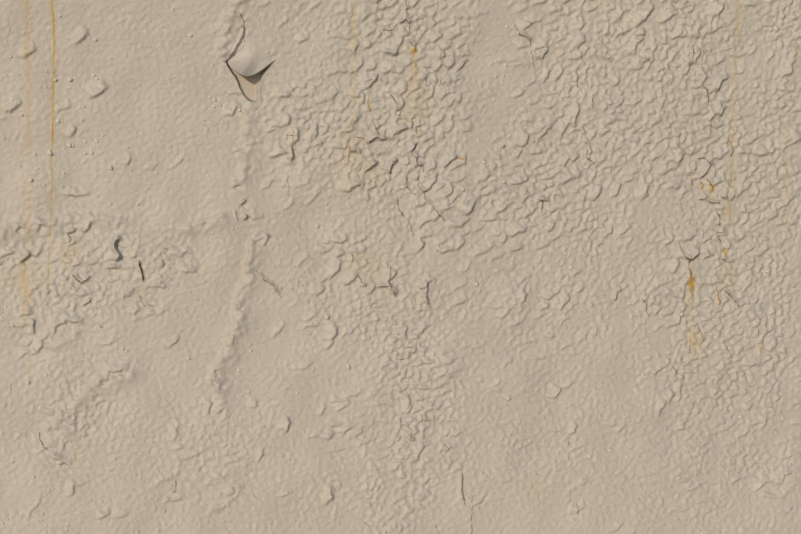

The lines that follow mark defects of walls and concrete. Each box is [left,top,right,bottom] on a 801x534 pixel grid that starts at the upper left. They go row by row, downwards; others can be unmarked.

peeling [226,8,285,102]
crack [376,0,420,53]
crack [703,79,724,137]
crack [346,76,467,237]
crack [679,143,741,307]